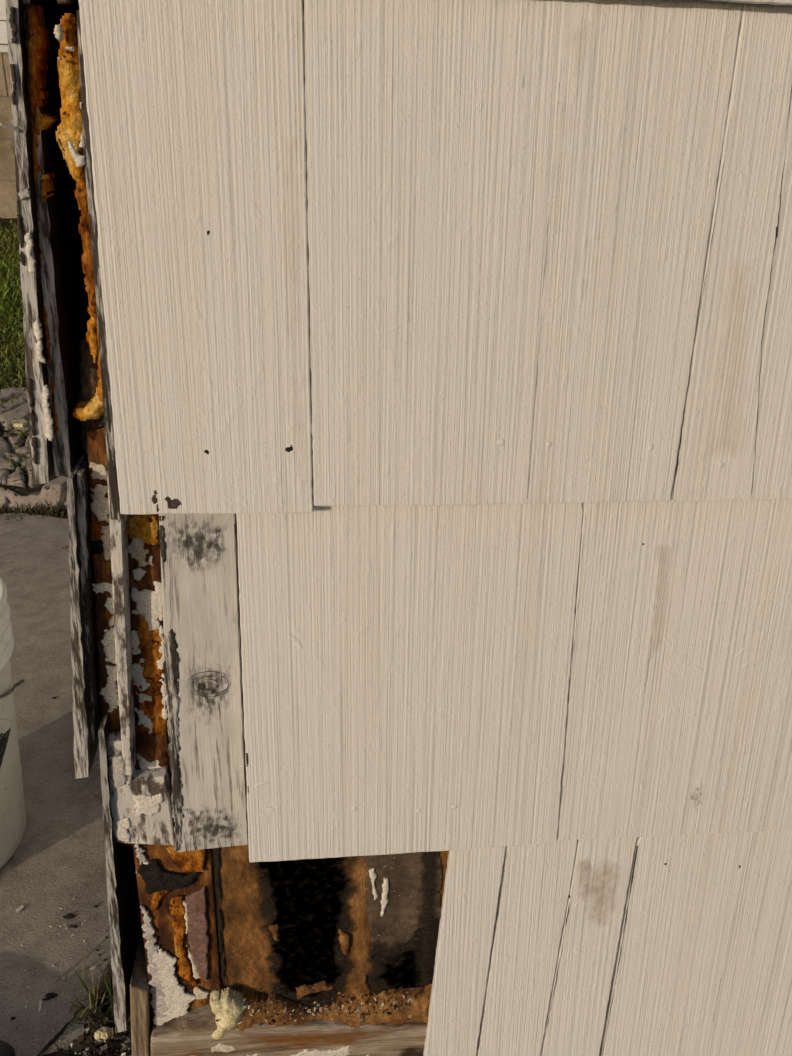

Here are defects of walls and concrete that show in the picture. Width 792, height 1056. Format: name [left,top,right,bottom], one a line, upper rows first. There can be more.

crack [672,121,731,500]
peeling [26,378,54,465]
damp [169,522,222,570]
peeling [92,582,119,712]
peeling [127,538,168,734]
damp [192,670,226,715]
damp [139,859,200,894]
peeling [140,886,209,1026]
damp [252,857,355,1008]
peeling [364,851,443,972]
damp [367,851,440,994]
crack [476,855,507,1056]